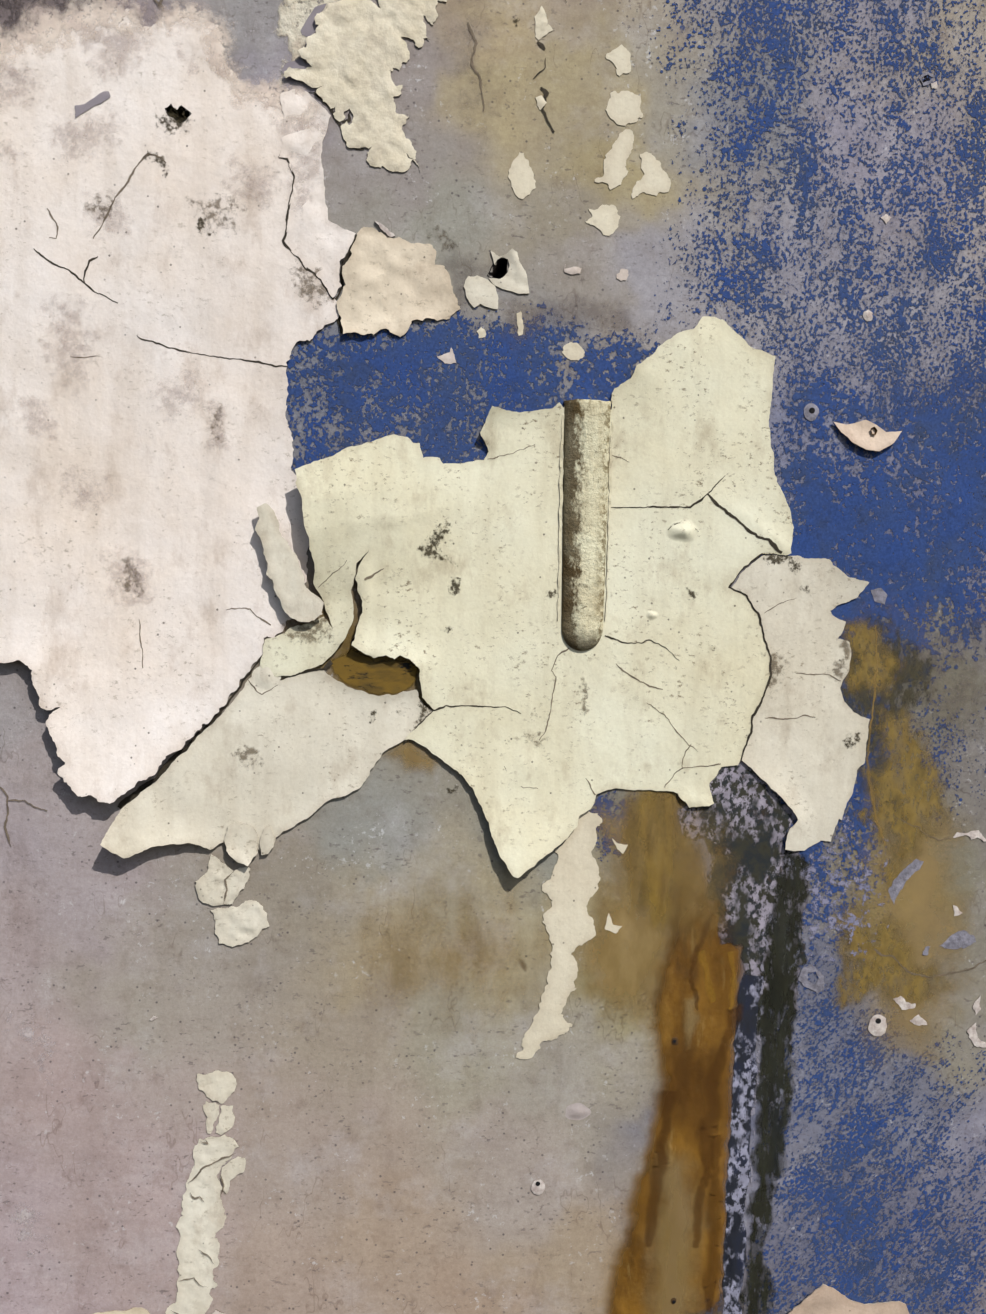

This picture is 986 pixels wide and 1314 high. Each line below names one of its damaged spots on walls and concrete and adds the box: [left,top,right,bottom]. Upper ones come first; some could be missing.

leakage [0,0,71,33]
crack [34,153,166,303]
crack [137,336,287,367]
crack [279,157,357,334]
peeling [464,275,504,312]
crack [605,476,841,788]
leakage [833,624,931,786]
corrosion [839,622,958,1039]
peeling [93,1070,246,1314]
corrosion [586,791,742,1314]
leakage [677,761,889,1314]
peeling [746,964,986,1314]